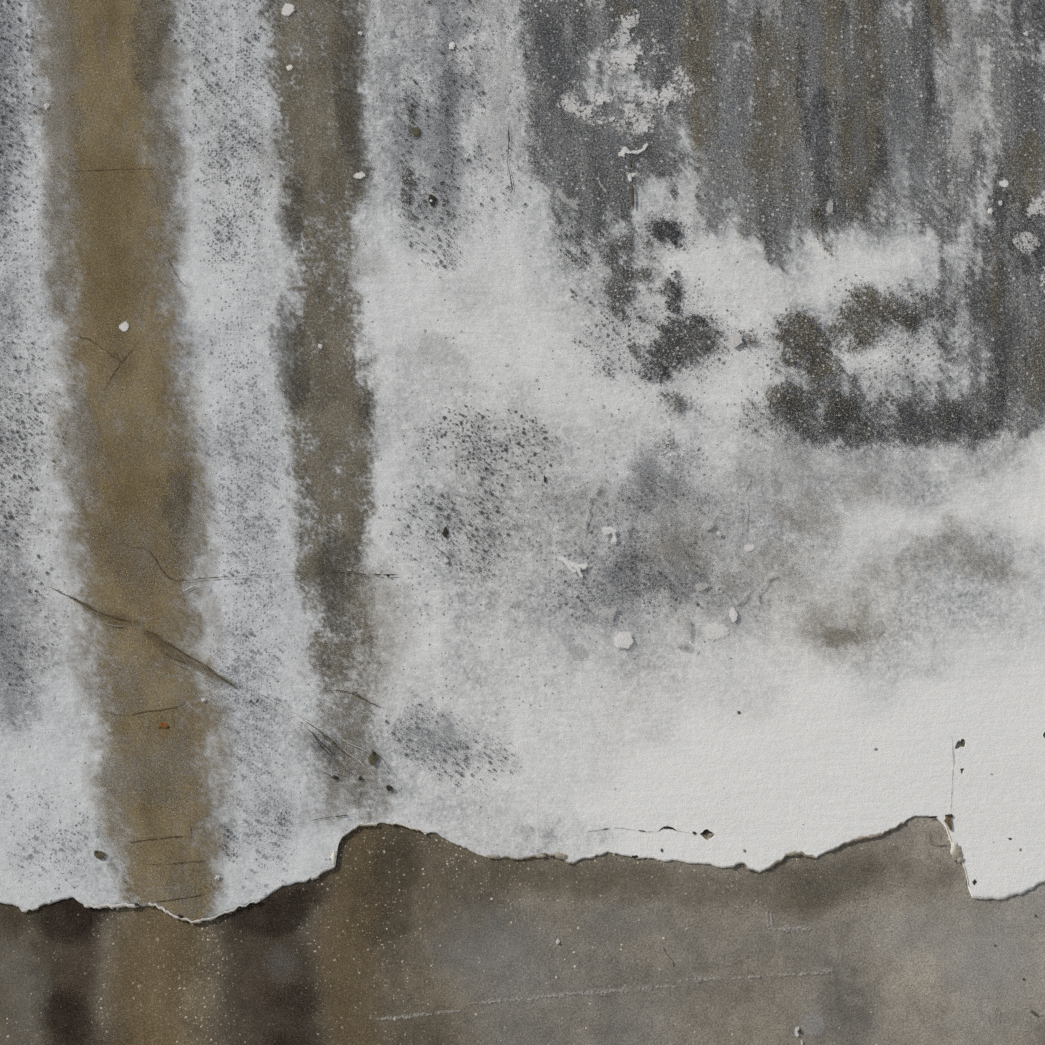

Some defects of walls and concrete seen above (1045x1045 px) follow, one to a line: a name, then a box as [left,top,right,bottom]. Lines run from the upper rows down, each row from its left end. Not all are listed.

leakage [390,0,1045,624]
leakage [0,0,386,1045]
crack [108,703,185,717]
crack [322,690,384,708]
peeling [0,814,1045,1045]